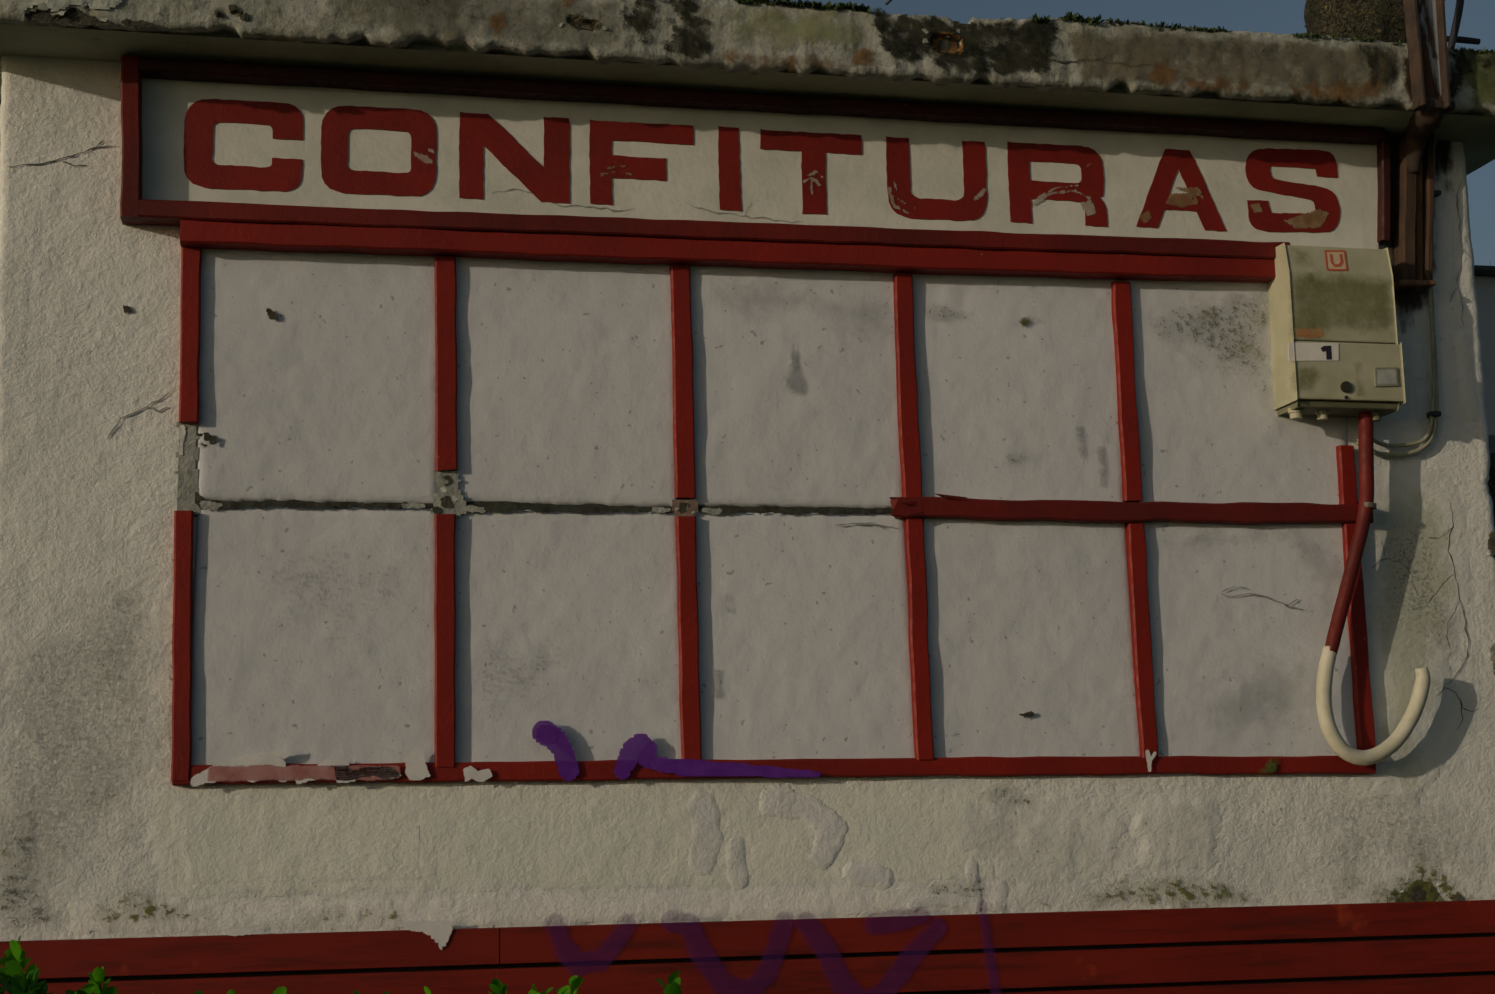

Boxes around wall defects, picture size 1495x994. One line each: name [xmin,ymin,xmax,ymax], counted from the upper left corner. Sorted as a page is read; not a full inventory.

spalling [15,0,157,28]
mould [621,0,711,60]
mould [873,8,1061,76]
mould [1449,49,1494,94]
crack [8,141,110,167]
mould [1156,300,1267,392]
crack [106,387,176,440]
crack [1372,499,1477,730]